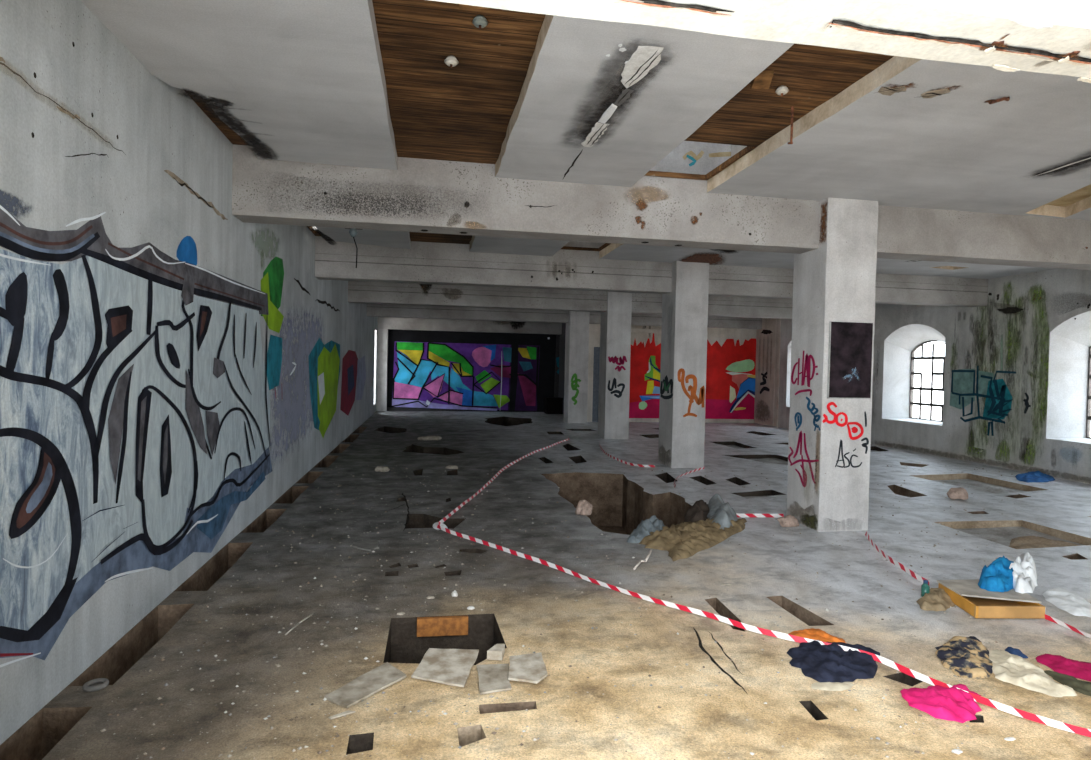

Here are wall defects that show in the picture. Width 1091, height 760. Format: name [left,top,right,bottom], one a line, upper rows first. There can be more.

crack [823,19,1091,65]
crack [0,57,126,158]
spalling [876,83,960,98]
peeling [1030,152,1091,178]
corrosion [634,187,667,229]
leakage [978,282,1049,453]